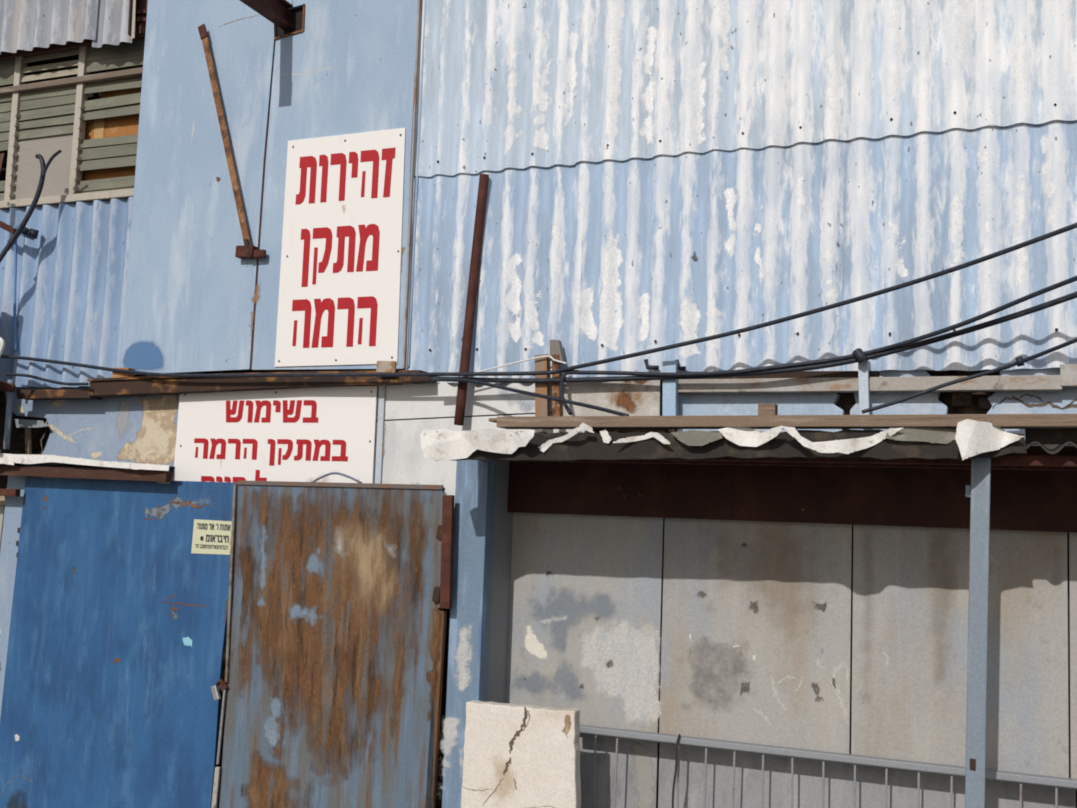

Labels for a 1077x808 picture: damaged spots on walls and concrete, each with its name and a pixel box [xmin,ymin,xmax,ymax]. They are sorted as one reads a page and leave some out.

peeling [721,187,742,259]
peeling [947,191,968,268]
peeling [975,144,999,305]
peeling [1010,174,1032,287]
peeling [502,225,653,351]
peeling [677,286,725,358]
flaking render [118,395,180,465]
peeling [144,497,209,520]
corrosion [235,489,424,808]
corrosion [425,609,447,808]
peeling [452,623,476,695]
crack [467,707,554,808]